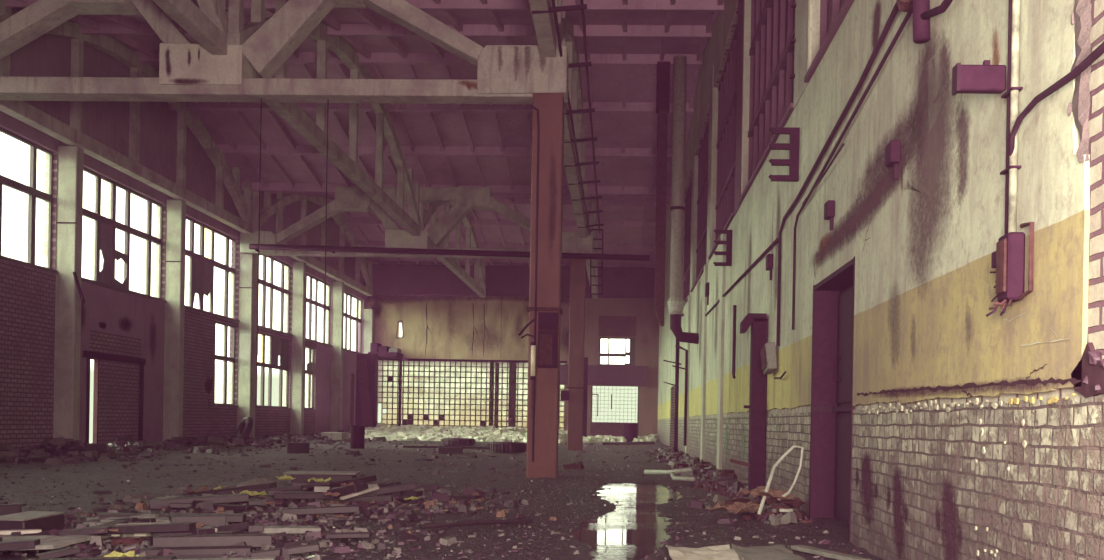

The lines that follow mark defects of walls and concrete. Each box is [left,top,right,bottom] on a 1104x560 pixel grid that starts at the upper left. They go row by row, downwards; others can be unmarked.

spalling [1067,0,1092,163]
leakage [813,62,928,266]
leakage [958,108,968,194]
spalling [862,342,1104,463]
leakage [855,452,907,557]
leakage [936,483,963,560]